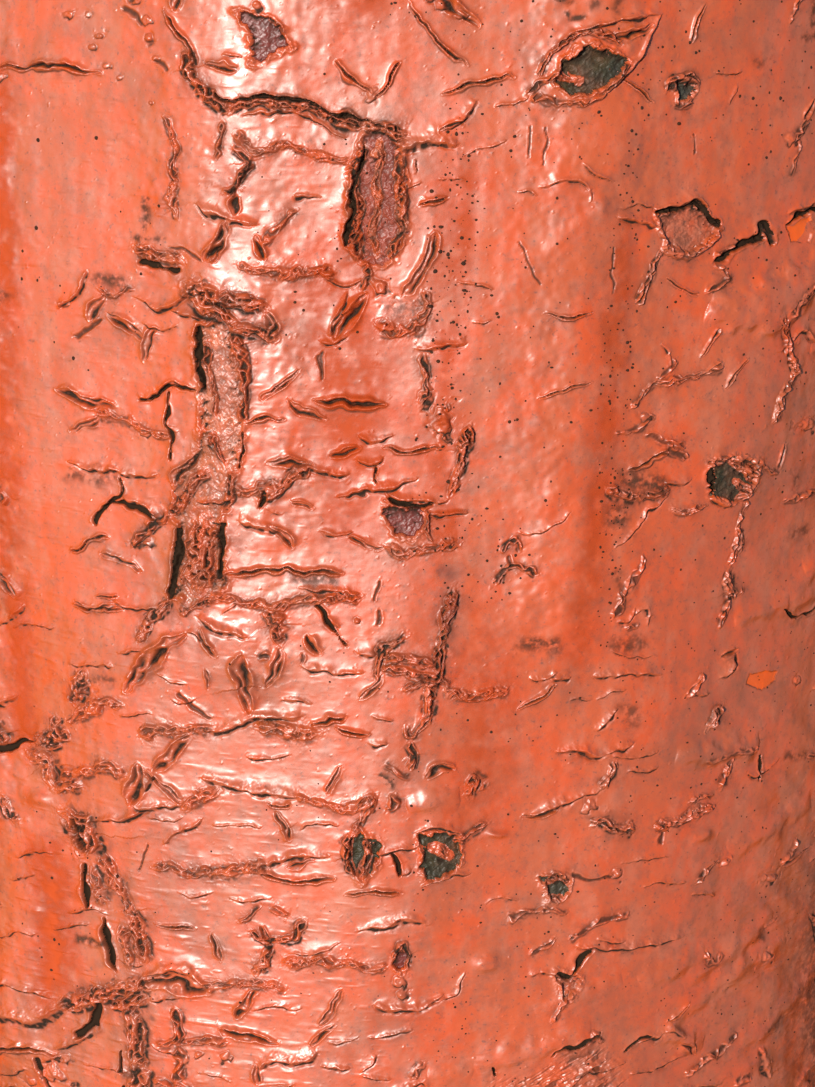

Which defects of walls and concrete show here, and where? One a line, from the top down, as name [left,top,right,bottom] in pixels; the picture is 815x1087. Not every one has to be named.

peeling [223,0,304,73]
peeling [494,6,705,117]
crack [59,0,415,352]
peeling [335,131,418,270]
peeling [650,190,726,269]
peeling [92,319,261,606]
peeling [377,420,482,544]
peeling [702,446,765,511]
crack [252,530,543,879]
peeling [294,782,388,889]
peeling [412,819,473,892]
peeling [534,864,579,906]